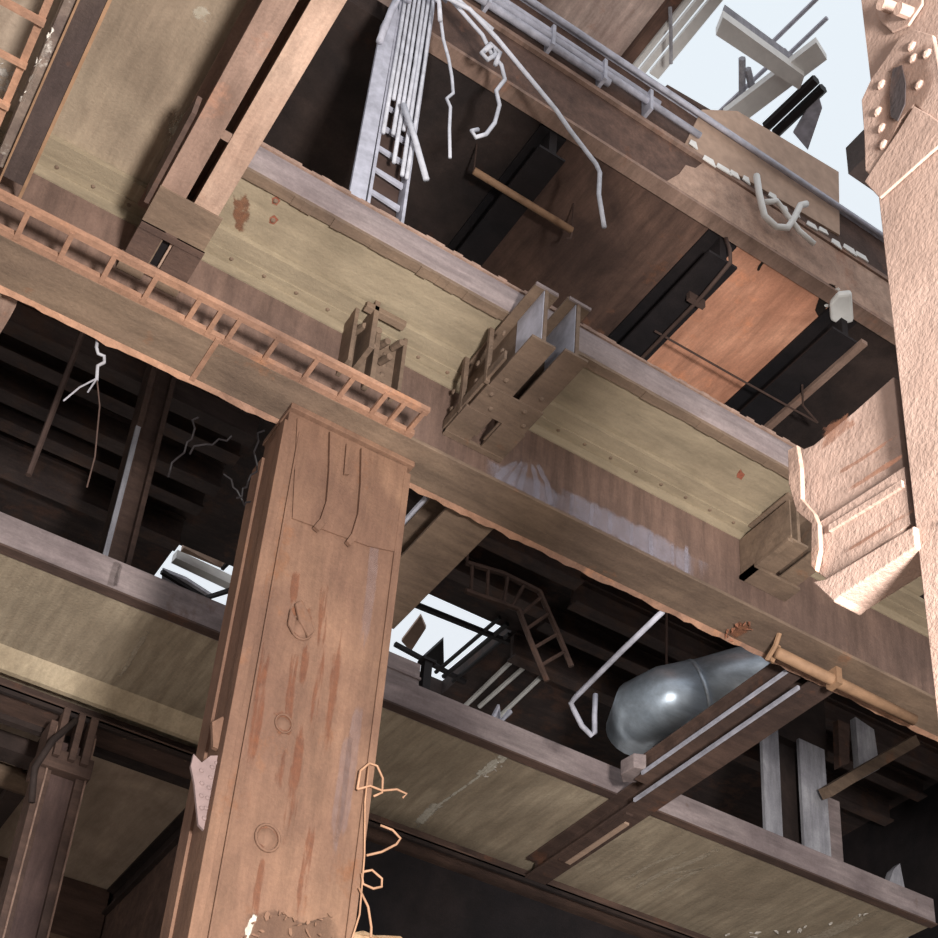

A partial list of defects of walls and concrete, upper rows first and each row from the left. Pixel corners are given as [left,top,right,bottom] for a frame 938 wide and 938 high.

corrosion [233,196,250,231]
corrosion [242,142,528,321]
corrosion [579,323,803,480]